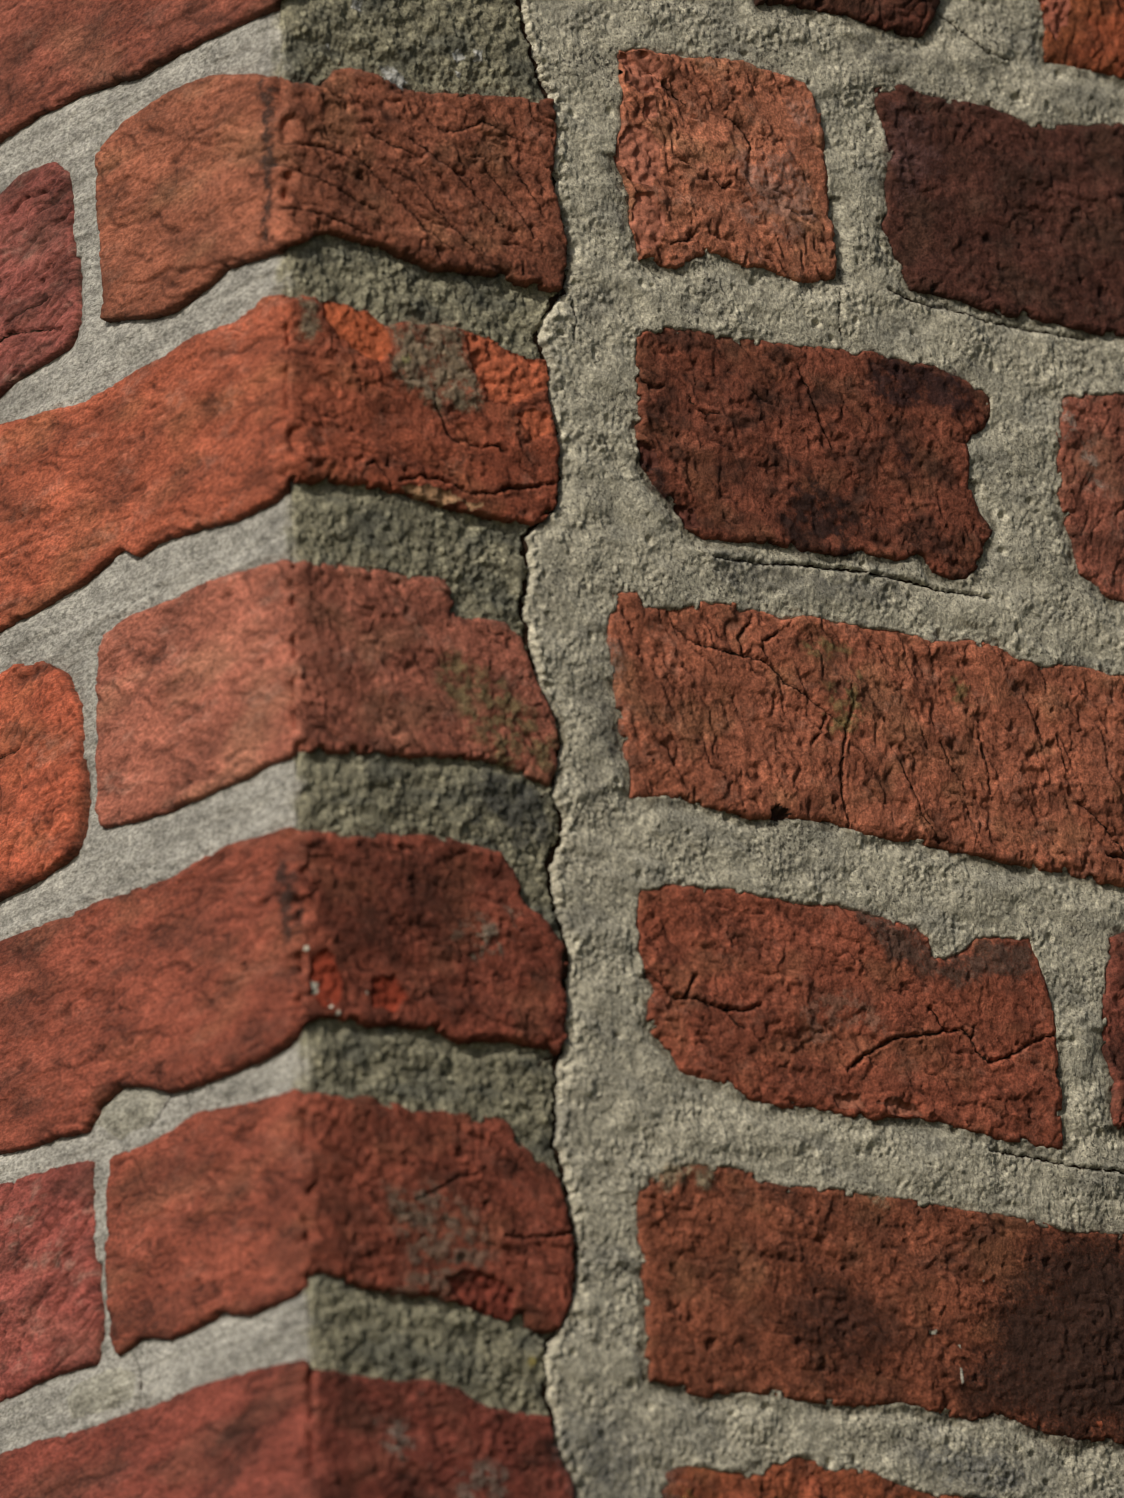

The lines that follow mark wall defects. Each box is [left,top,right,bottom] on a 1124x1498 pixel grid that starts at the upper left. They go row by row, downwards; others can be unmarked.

crack [515,0,548,99]
crack [368,402,562,679]
crack [713,556,984,598]
crack [506,712,578,1442]
crack [643,973,757,1028]
crack [847,1008,1054,1072]